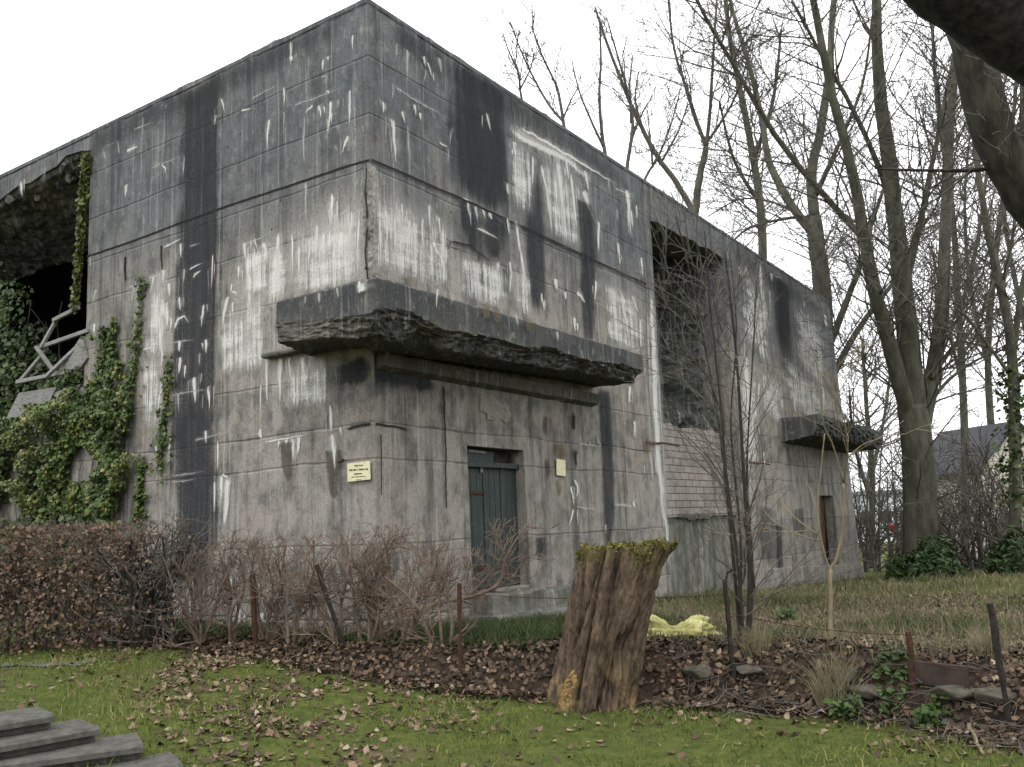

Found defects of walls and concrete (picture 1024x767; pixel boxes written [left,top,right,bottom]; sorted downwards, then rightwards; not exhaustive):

leakage [129,40,431,615]
crack [86,158,647,285]
spalling [299,311,639,383]
leakage [375,32,669,542]